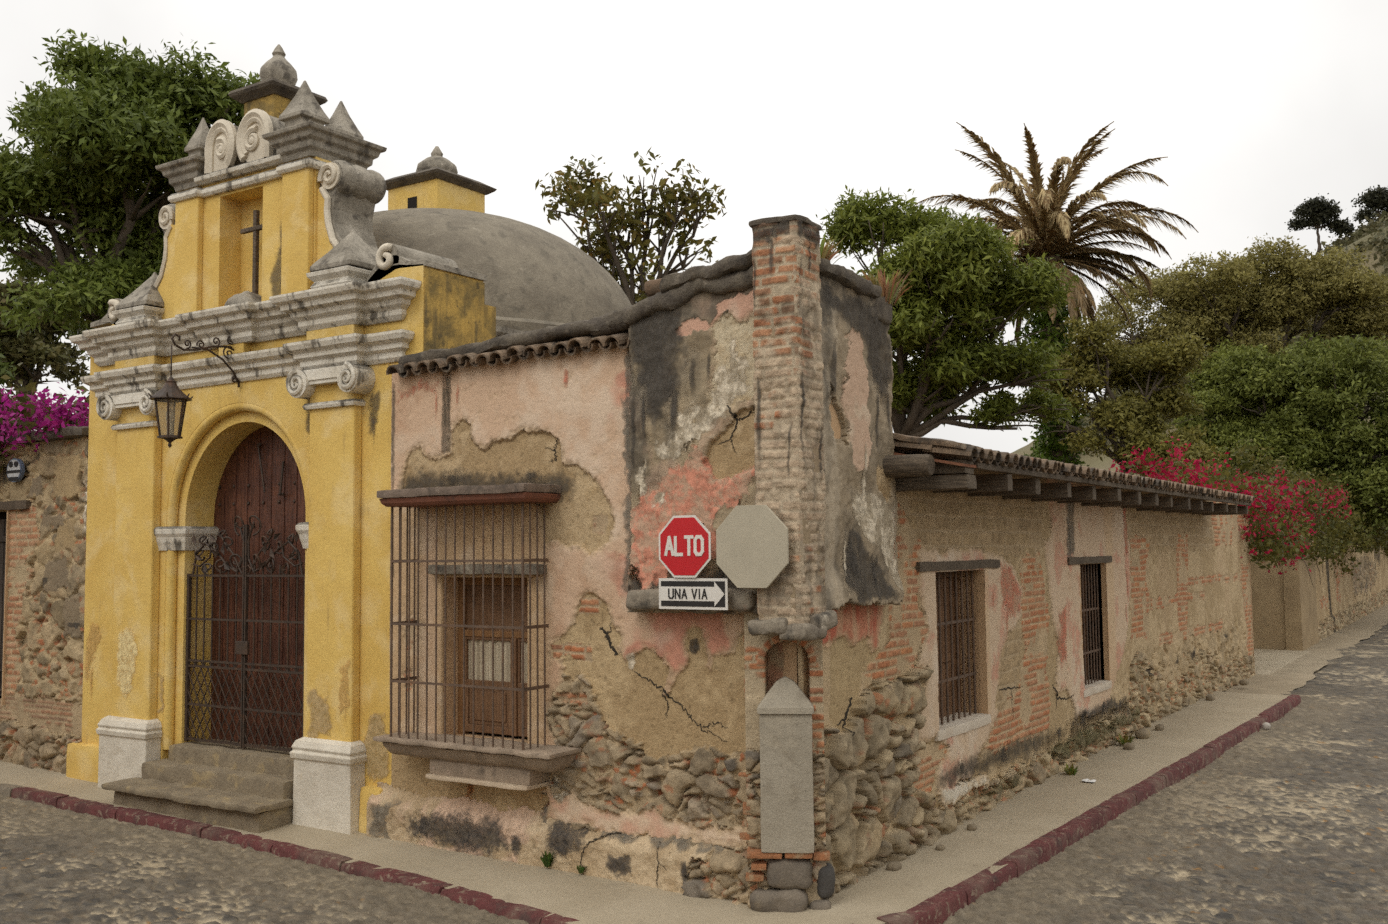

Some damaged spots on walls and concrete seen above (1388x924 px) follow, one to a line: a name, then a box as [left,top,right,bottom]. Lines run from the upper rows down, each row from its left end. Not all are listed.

peeling [629,339,755,590]
flaking render [1209,501,1248,547]
crack [599,623,727,742]
flaking render [981,551,1051,761]
flaking render [1130,535,1150,641]
flaking render [1187,563,1254,656]
leakage [406,812,520,856]